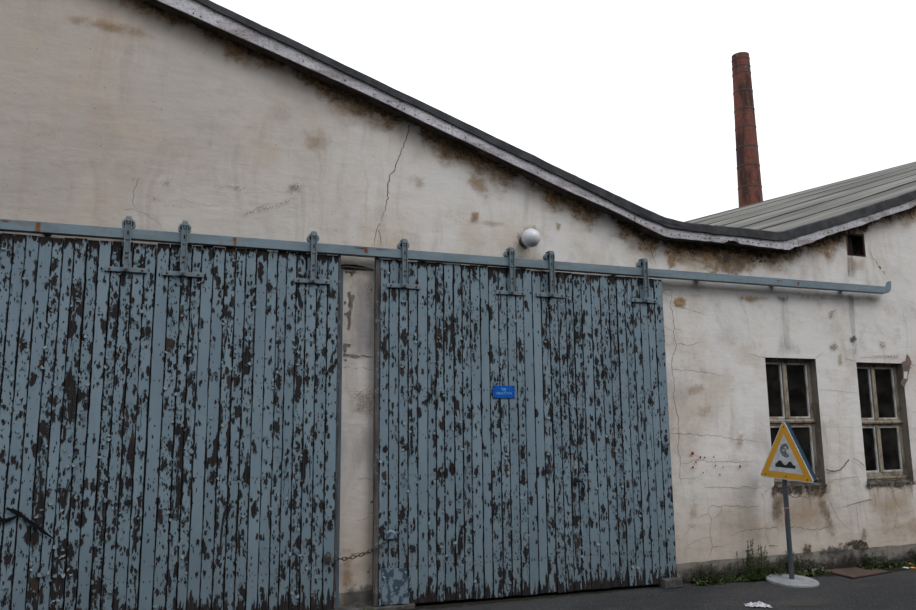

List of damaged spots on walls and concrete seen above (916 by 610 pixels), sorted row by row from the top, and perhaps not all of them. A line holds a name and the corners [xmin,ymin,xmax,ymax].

leakage [415,124,516,190]
crack [374,121,410,243]
leakage [528,178,598,220]
leakage [611,205,916,275]
spalling [901,355,914,388]
crack [662,289,916,555]
leakage [772,484,832,525]
peeling [29,542,73,581]
leakage [804,540,869,555]